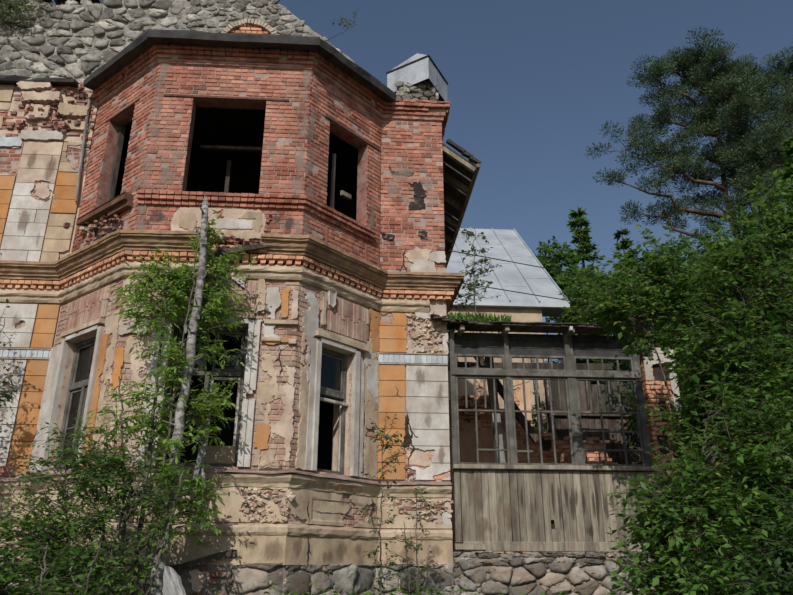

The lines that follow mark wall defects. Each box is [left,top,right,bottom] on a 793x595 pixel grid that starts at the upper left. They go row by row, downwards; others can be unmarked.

flaking render [0,78,98,177]
flaking render [31,181,55,202]
spalling [389,165,427,211]
flaking render [171,207,274,240]
flaking render [404,230,446,273]
flaking render [215,276,246,302]
flaking render [405,309,449,354]
flaking render [252,279,337,470]
crack [394,388,417,461]
flaking render [402,447,450,486]
flaking render [239,487,296,523]
crack [307,500,374,564]